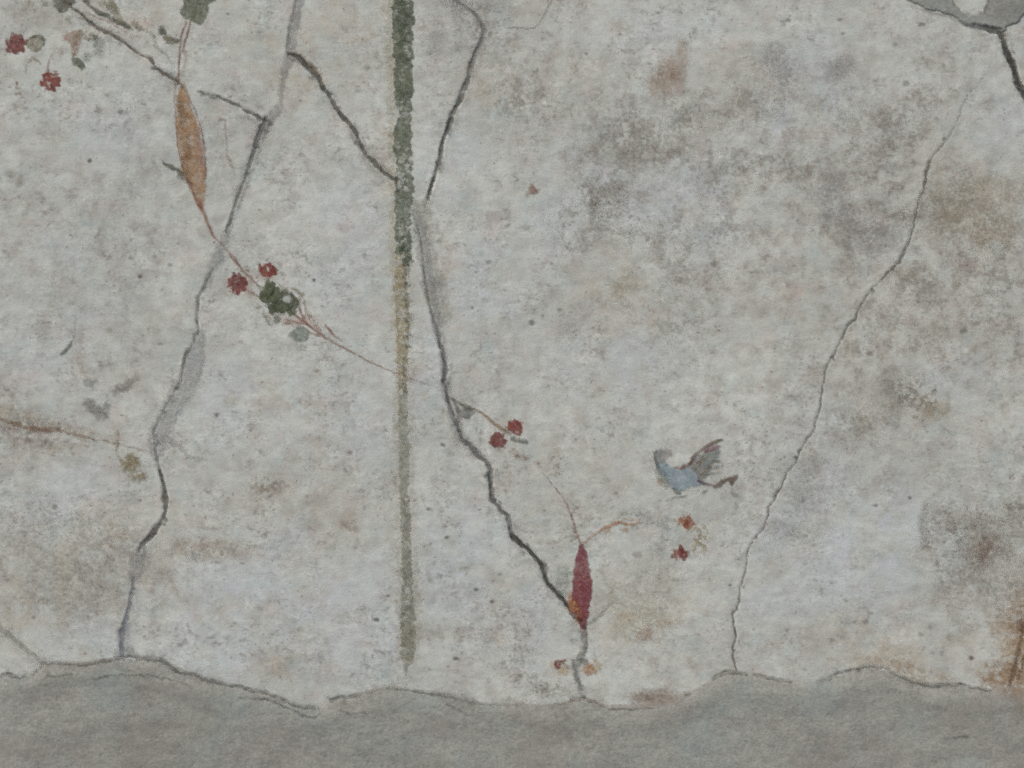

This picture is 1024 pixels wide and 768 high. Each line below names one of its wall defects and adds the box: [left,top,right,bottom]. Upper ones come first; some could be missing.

crack [46,0,400,716]
crack [413,0,577,619]
crack [713,137,945,679]
crack [986,30,1024,99]
crack [900,676,981,689]